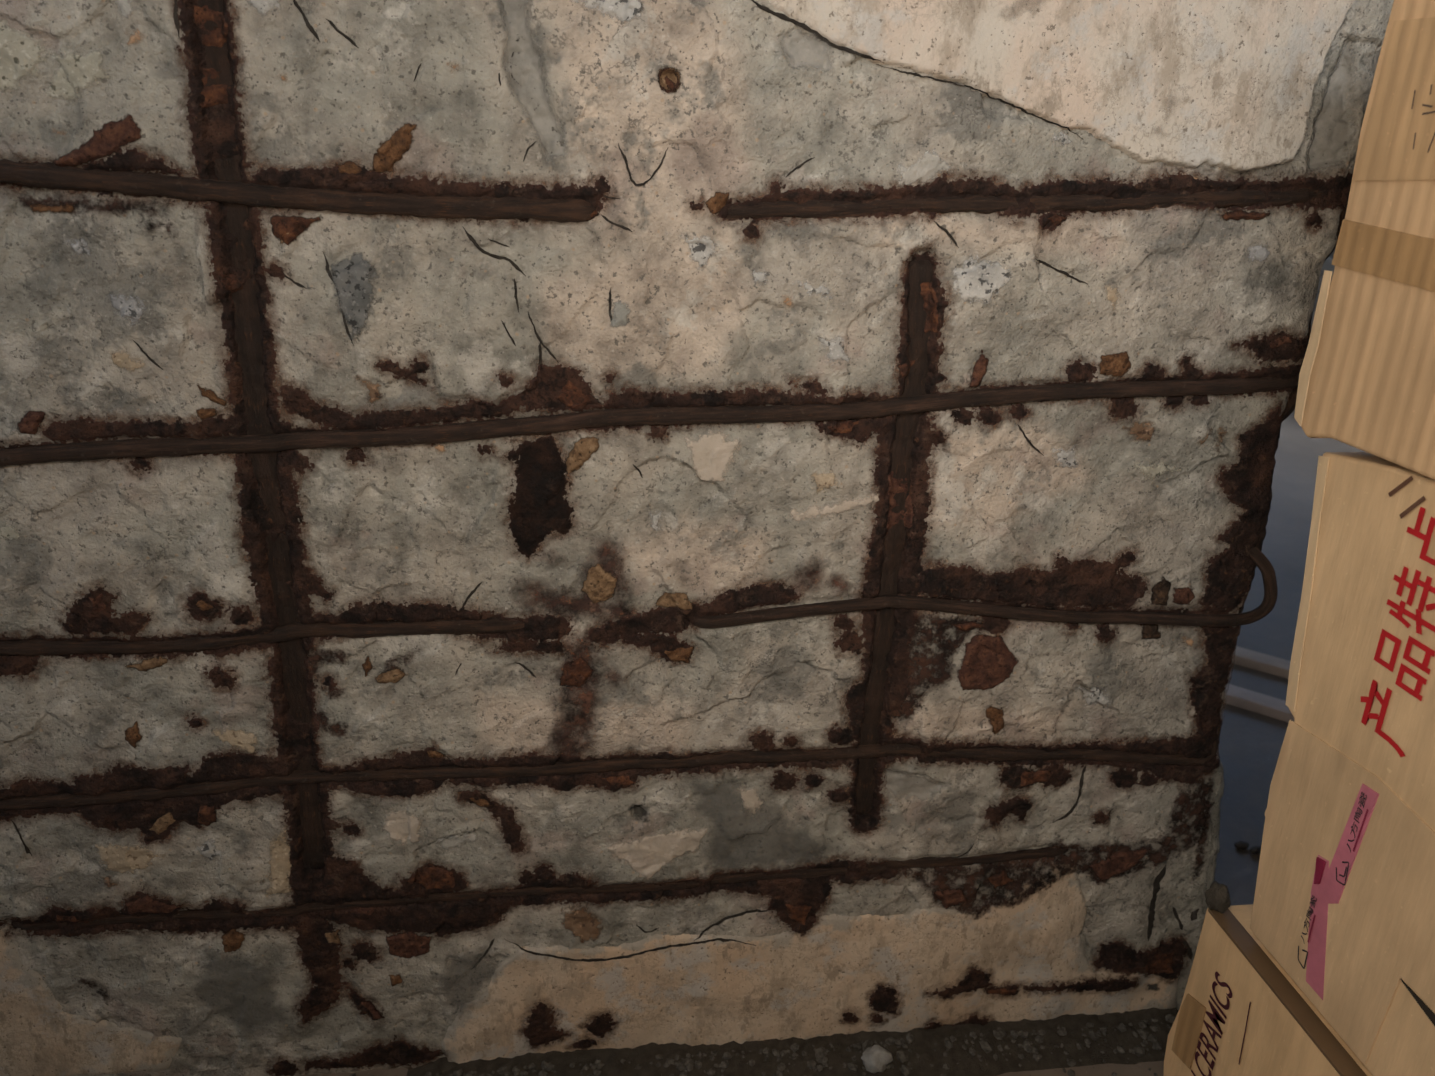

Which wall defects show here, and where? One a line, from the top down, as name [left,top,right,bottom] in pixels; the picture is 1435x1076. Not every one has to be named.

spalling [0,0,198,178]
spalling [0,183,233,448]
corrosion [0,0,615,221]
spalling [227,0,1394,430]
crack [751,0,1084,140]
corrosion [689,168,1353,243]
spalling [0,390,1289,1076]
corrosion [0,182,1310,1076]
crack [474,909,769,968]